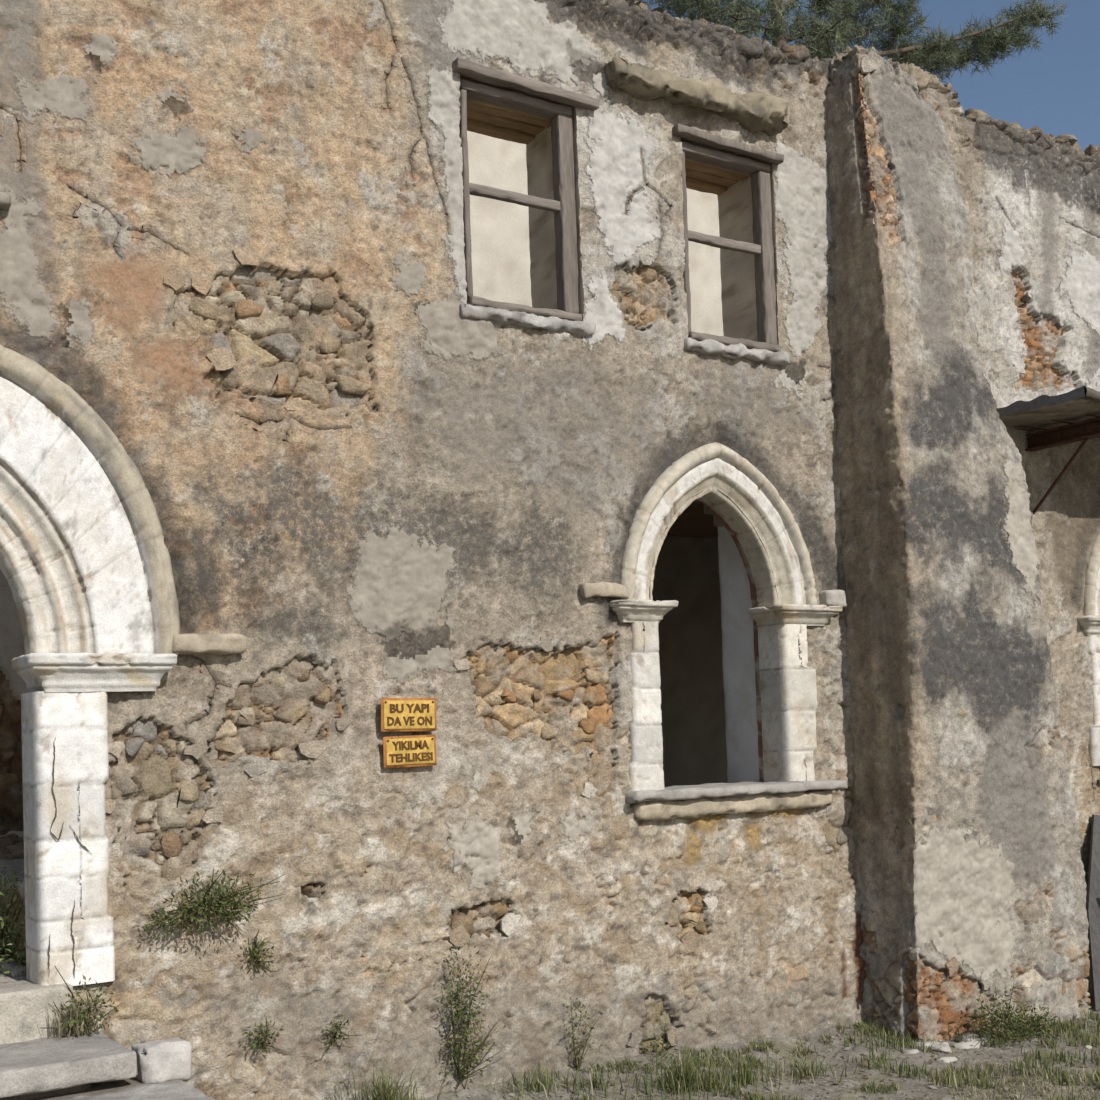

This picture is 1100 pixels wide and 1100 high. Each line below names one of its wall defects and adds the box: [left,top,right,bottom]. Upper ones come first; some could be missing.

flaking render [163,244,375,412]
crack [378,0,461,286]
flaking render [386,0,674,363]
damp [896,161,996,448]
damp [974,116,1100,321]
damp [903,461,1024,582]
flaking render [0,669,24,835]
crack [50,737,92,854]
flaking render [343,520,627,845]
damp [907,583,1053,878]
crack [48,900,76,978]
flaking render [904,824,1017,1042]